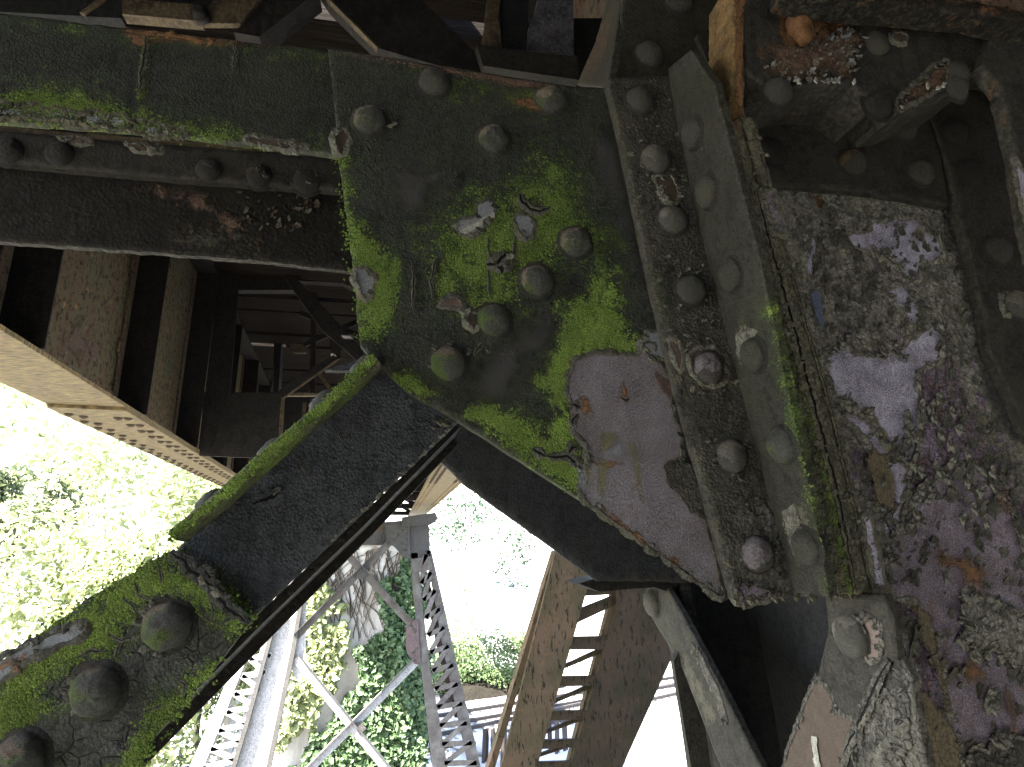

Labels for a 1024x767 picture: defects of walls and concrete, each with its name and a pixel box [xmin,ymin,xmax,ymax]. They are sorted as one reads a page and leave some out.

rust [768,16,865,78]
peeling [0,100,188,156]
peeling [451,197,500,240]
peeling [513,211,538,243]
peeling [563,94,1024,767]
crack [78,549,250,658]